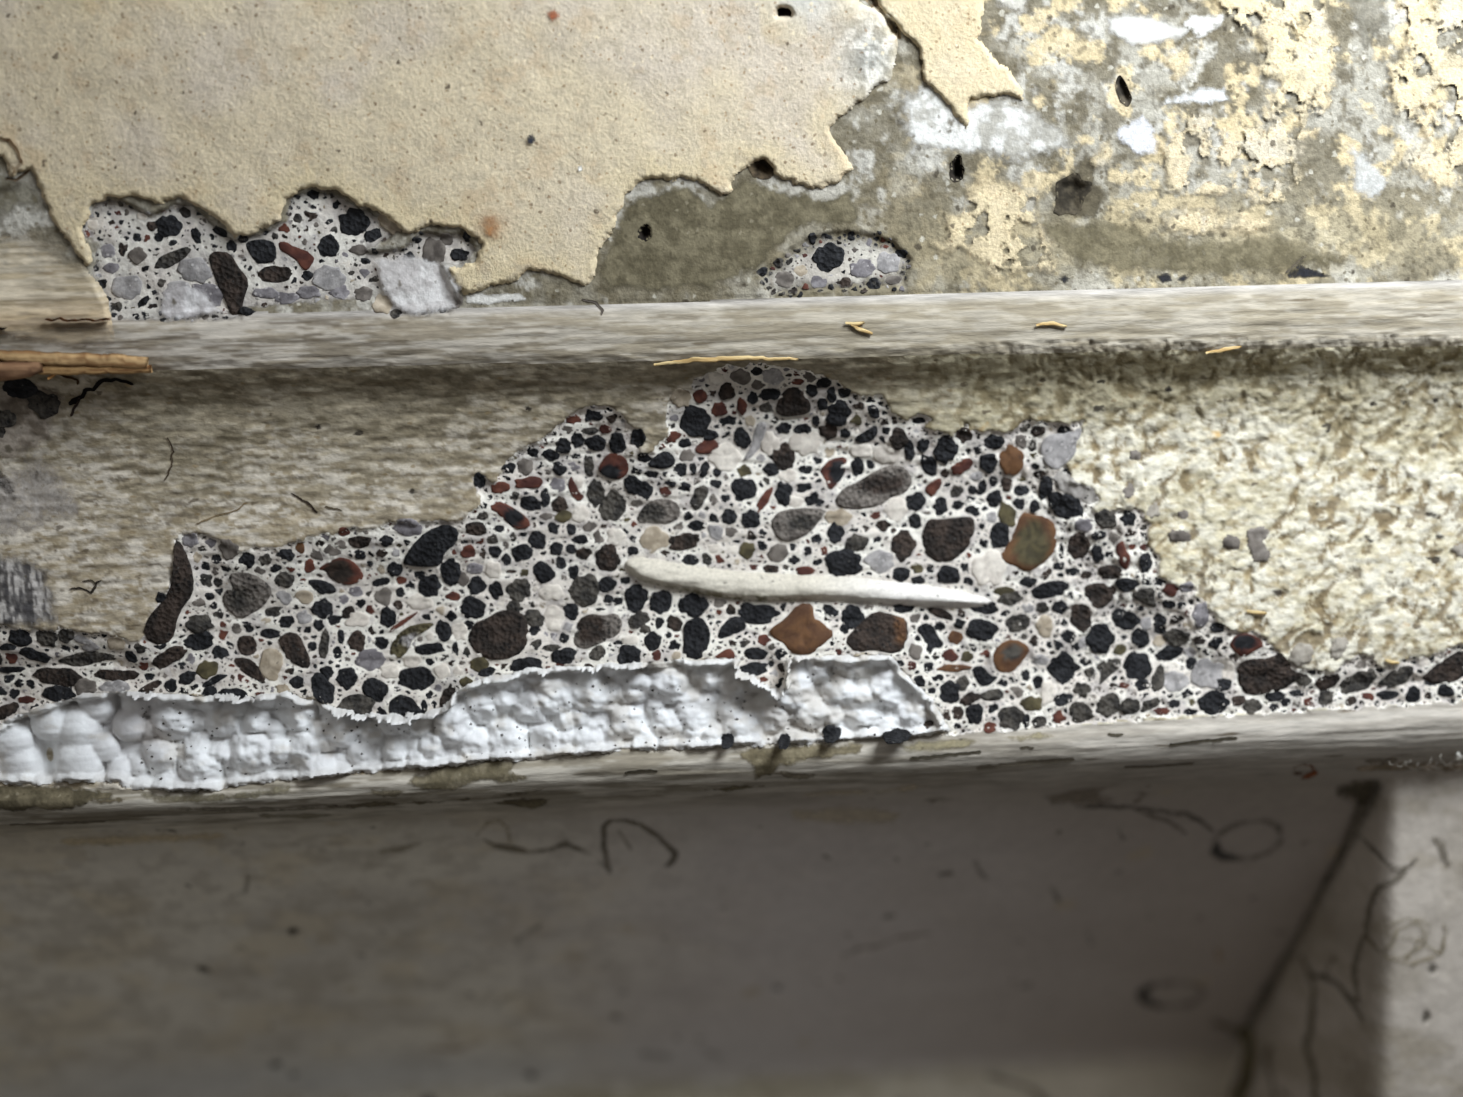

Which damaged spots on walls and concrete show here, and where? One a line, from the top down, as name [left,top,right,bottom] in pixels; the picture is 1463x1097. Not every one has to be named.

peeling [0,0,1024,322]
peeling [932,143,1113,278]
spalling [1116,75,1132,106]
peeling [1160,0,1338,235]
peeling [1389,0,1463,189]
spalling [0,362,1463,736]
crack [1301,837,1451,1097]